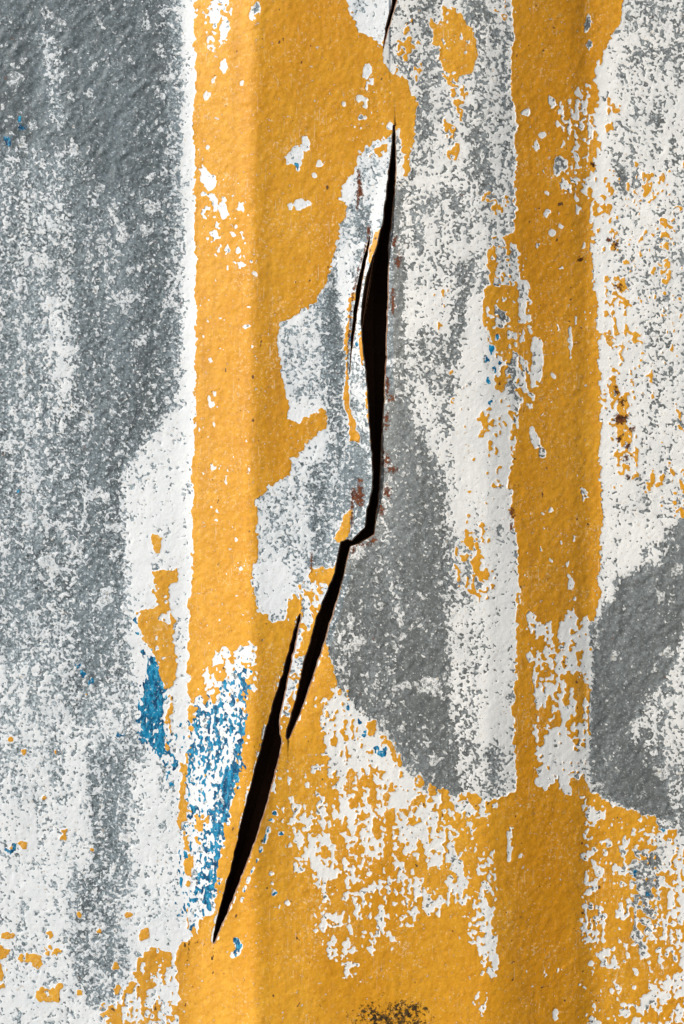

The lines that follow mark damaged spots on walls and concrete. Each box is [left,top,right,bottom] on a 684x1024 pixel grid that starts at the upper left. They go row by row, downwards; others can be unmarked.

peeling [0,0,258,1024]
crack [349,235,378,374]
peeling [244,0,684,1024]